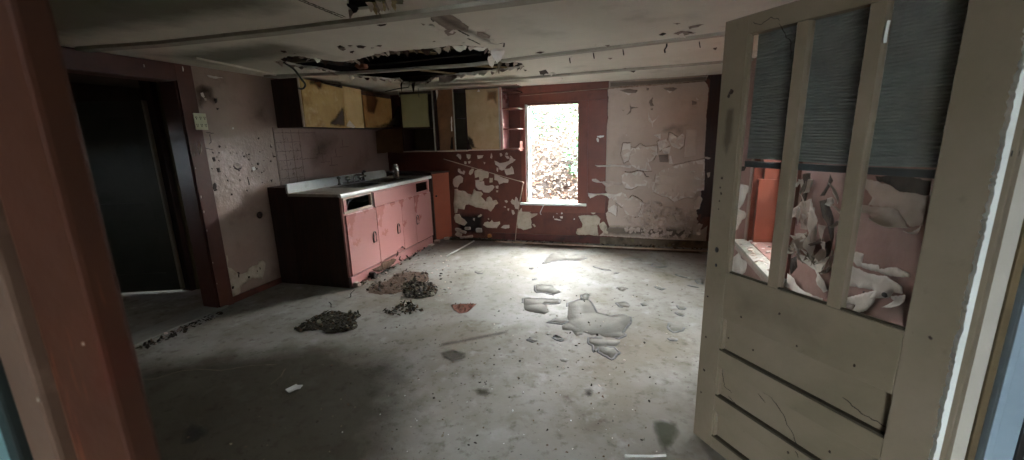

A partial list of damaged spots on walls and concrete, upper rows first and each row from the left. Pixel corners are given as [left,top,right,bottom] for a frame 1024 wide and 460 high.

peeling [226,255,266,296]
peeling [453,152,538,230]
peeling [553,88,723,240]
peeling [784,173,840,300]